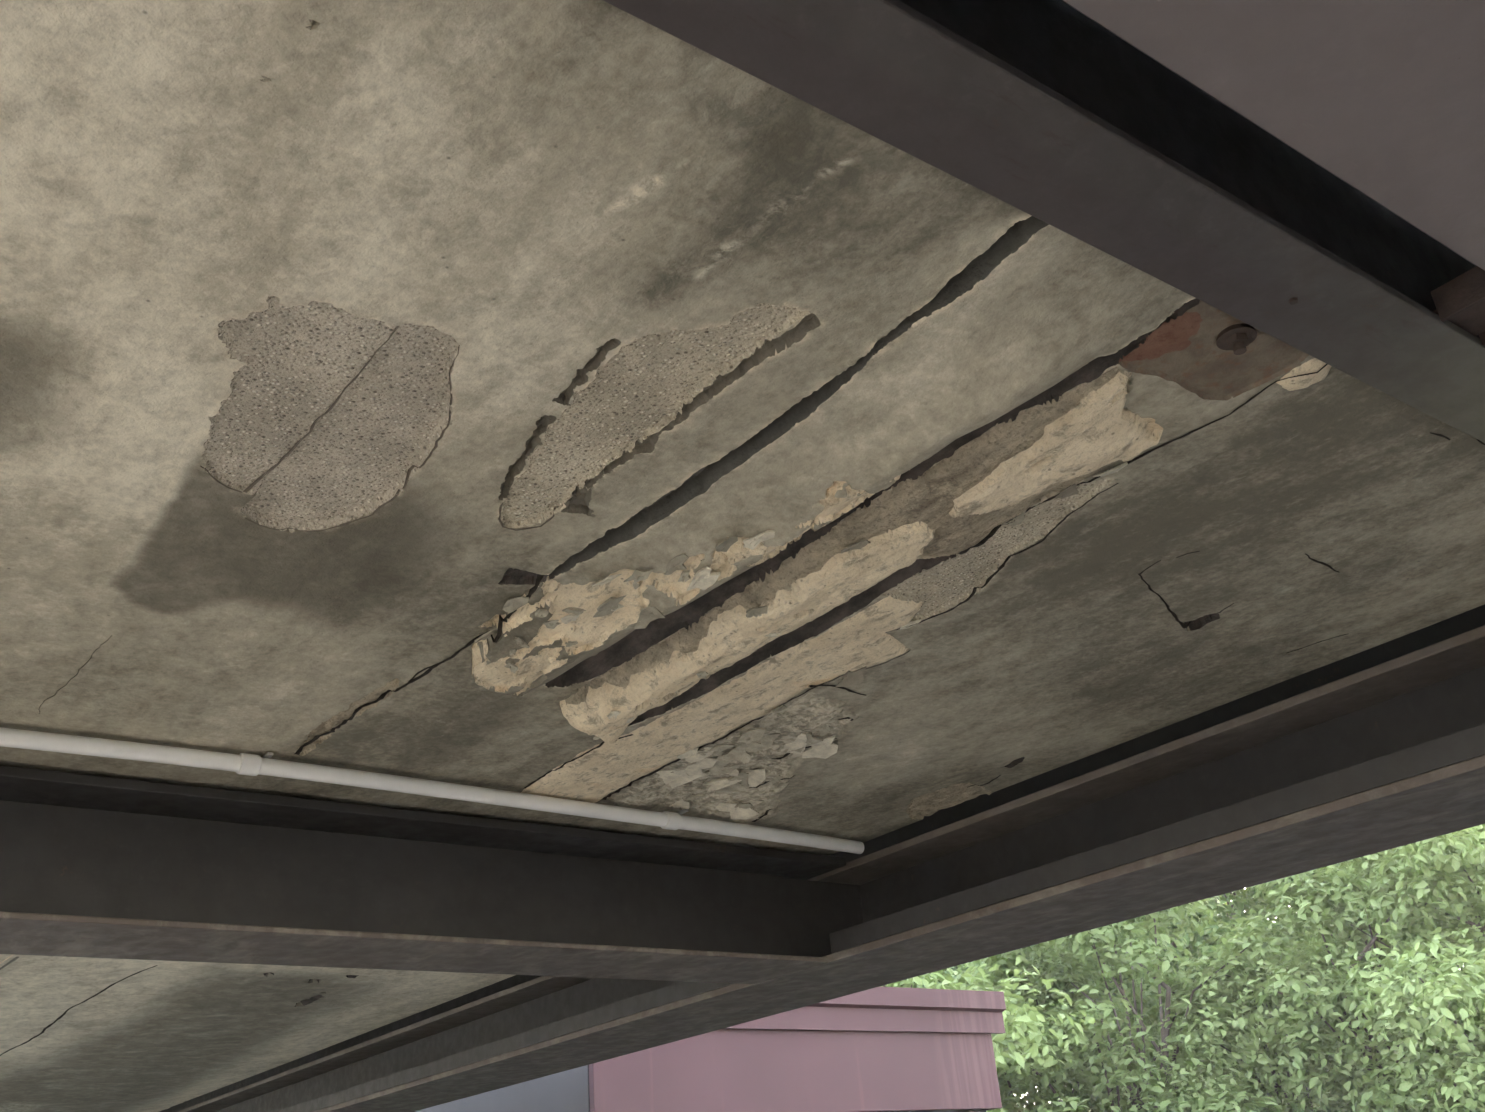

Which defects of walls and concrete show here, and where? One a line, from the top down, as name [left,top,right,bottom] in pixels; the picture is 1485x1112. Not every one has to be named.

damp [0,292,127,475]
peeling [200,296,460,532]
peeling [498,303,821,531]
rust [1119,312,1203,362]
damp [104,432,510,699]
crack [294,574,544,755]
peeling [498,568,555,585]
flaking render [521,479,1114,824]
crack [602,364,1328,800]
crack [0,954,19,970]
crack [0,965,157,1056]